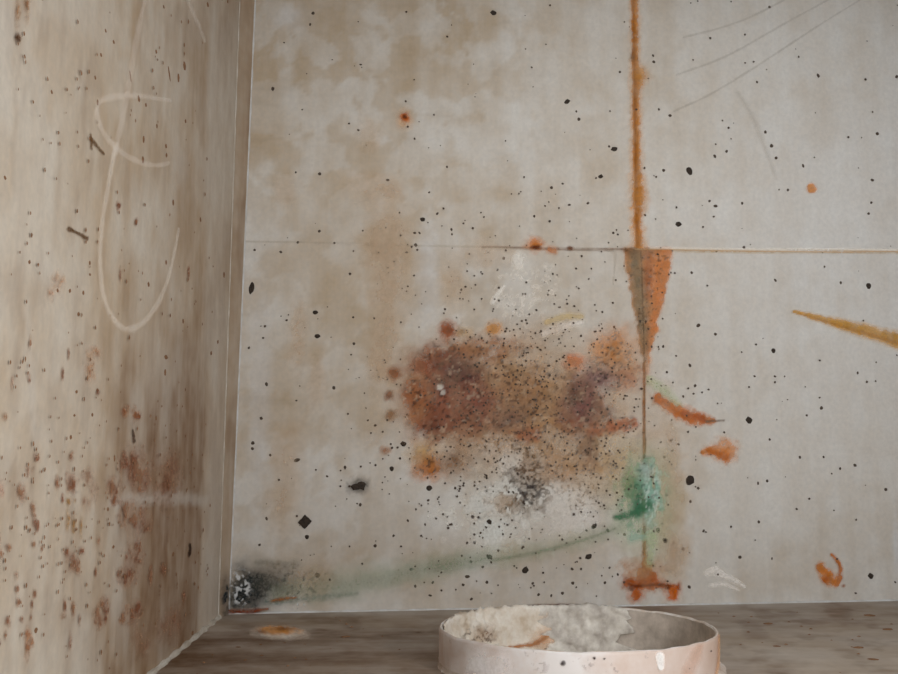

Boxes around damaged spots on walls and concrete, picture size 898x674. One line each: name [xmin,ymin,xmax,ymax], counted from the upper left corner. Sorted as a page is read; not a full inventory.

corrosion [386,0,717,475]
corrosion [793,310,898,348]
corrosion [701,441,735,462]
damp [614,458,664,540]
damp [223,563,330,614]
corrosion [623,522,680,601]
corrosion [816,553,844,587]